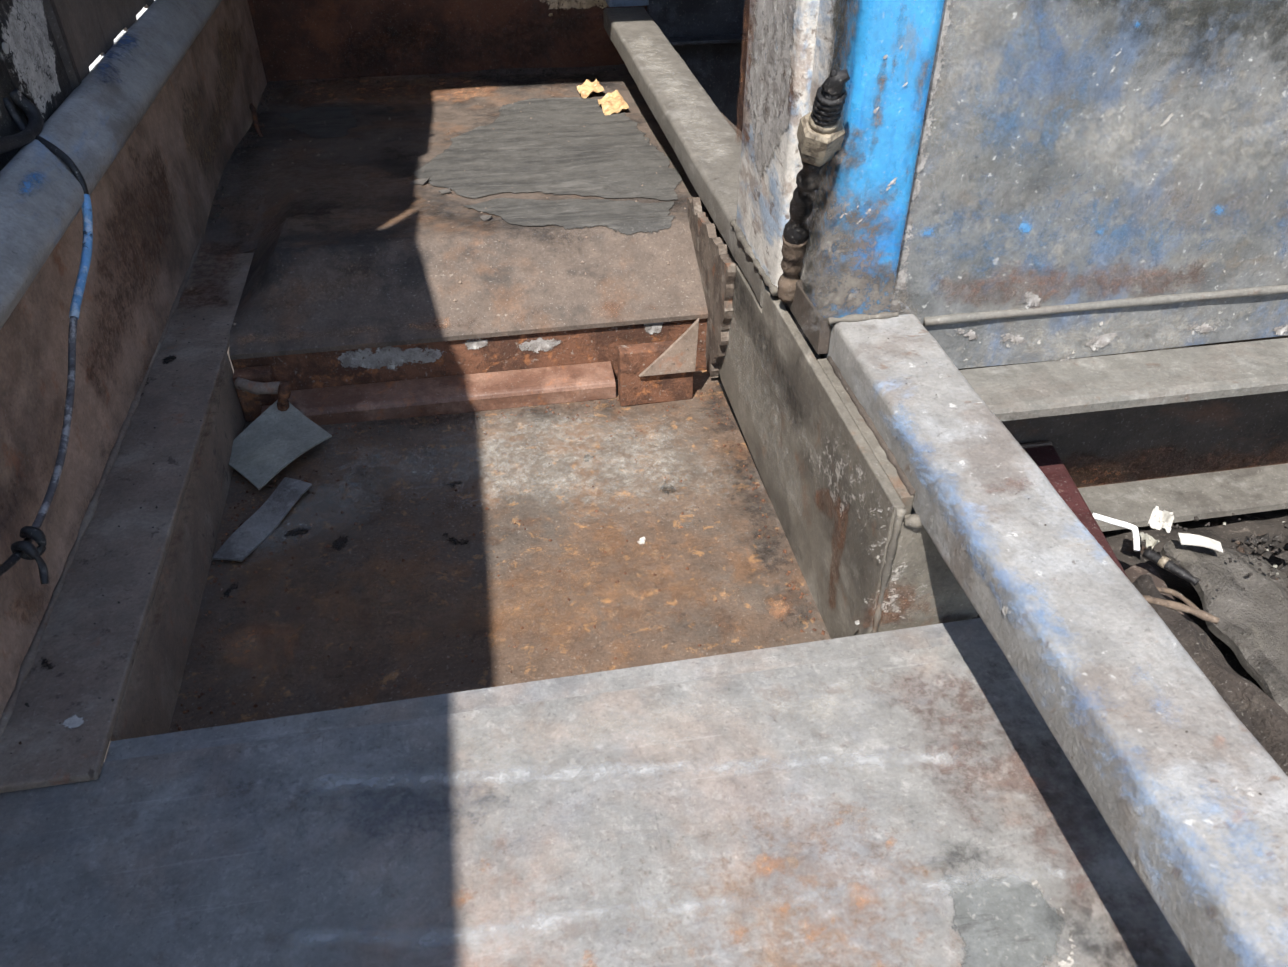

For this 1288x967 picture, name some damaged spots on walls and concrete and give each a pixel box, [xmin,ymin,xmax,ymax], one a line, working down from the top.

peeling [540,0,609,16]
peeling [410,97,683,235]
peeling [940,874,1076,967]